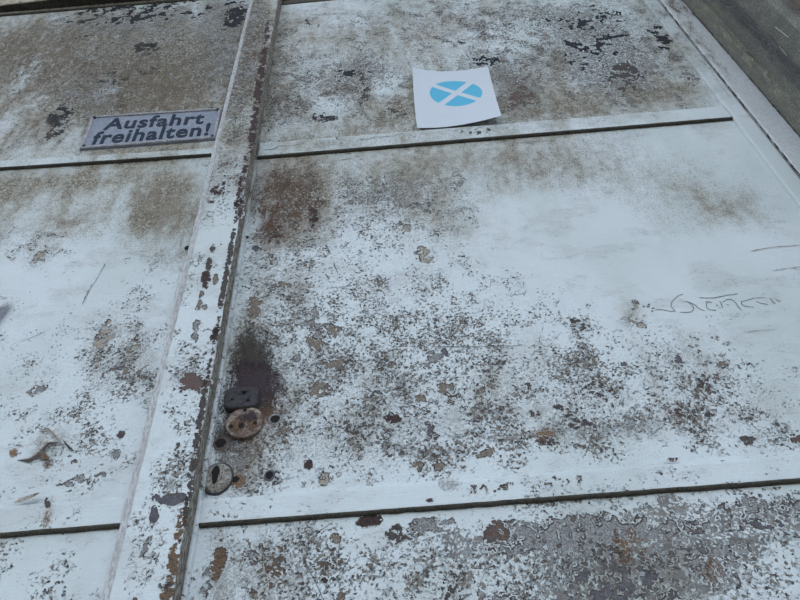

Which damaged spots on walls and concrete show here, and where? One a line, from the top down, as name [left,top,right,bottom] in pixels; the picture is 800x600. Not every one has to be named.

leakage [0,12,223,113]
peeling [55,0,261,56]
peeling [531,4,646,94]
peeling [93,314,142,381]
rust [159,10,270,600]
peeling [302,305,345,371]
peeling [423,348,458,406]
peeling [55,471,113,488]
peeling [303,458,334,487]
peeling [470,481,514,494]
peeling [355,514,457,546]
peeling [477,489,800,600]